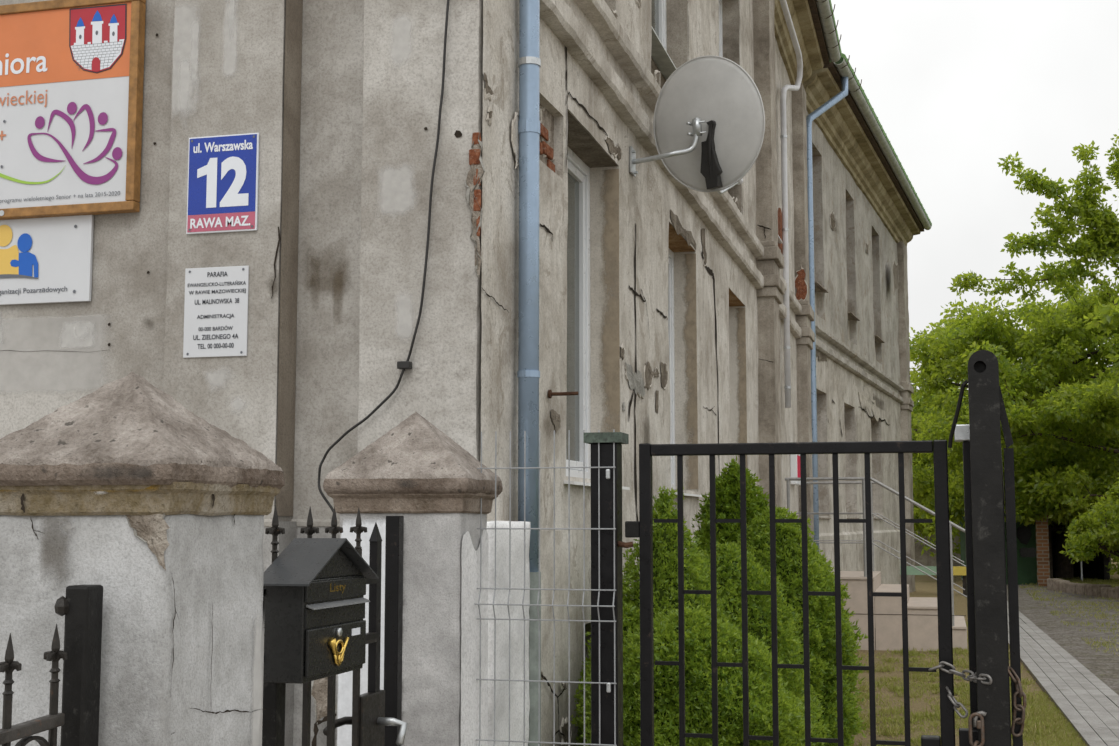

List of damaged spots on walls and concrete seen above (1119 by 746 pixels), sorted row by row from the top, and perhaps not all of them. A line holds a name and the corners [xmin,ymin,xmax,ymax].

flaking render [539,106,555,172]
flaking render [465,73,494,277]
peeling [601,136,668,432]
flaking render [795,266,808,301]
spalling [125,513,170,571]
crack [190,707,266,715]